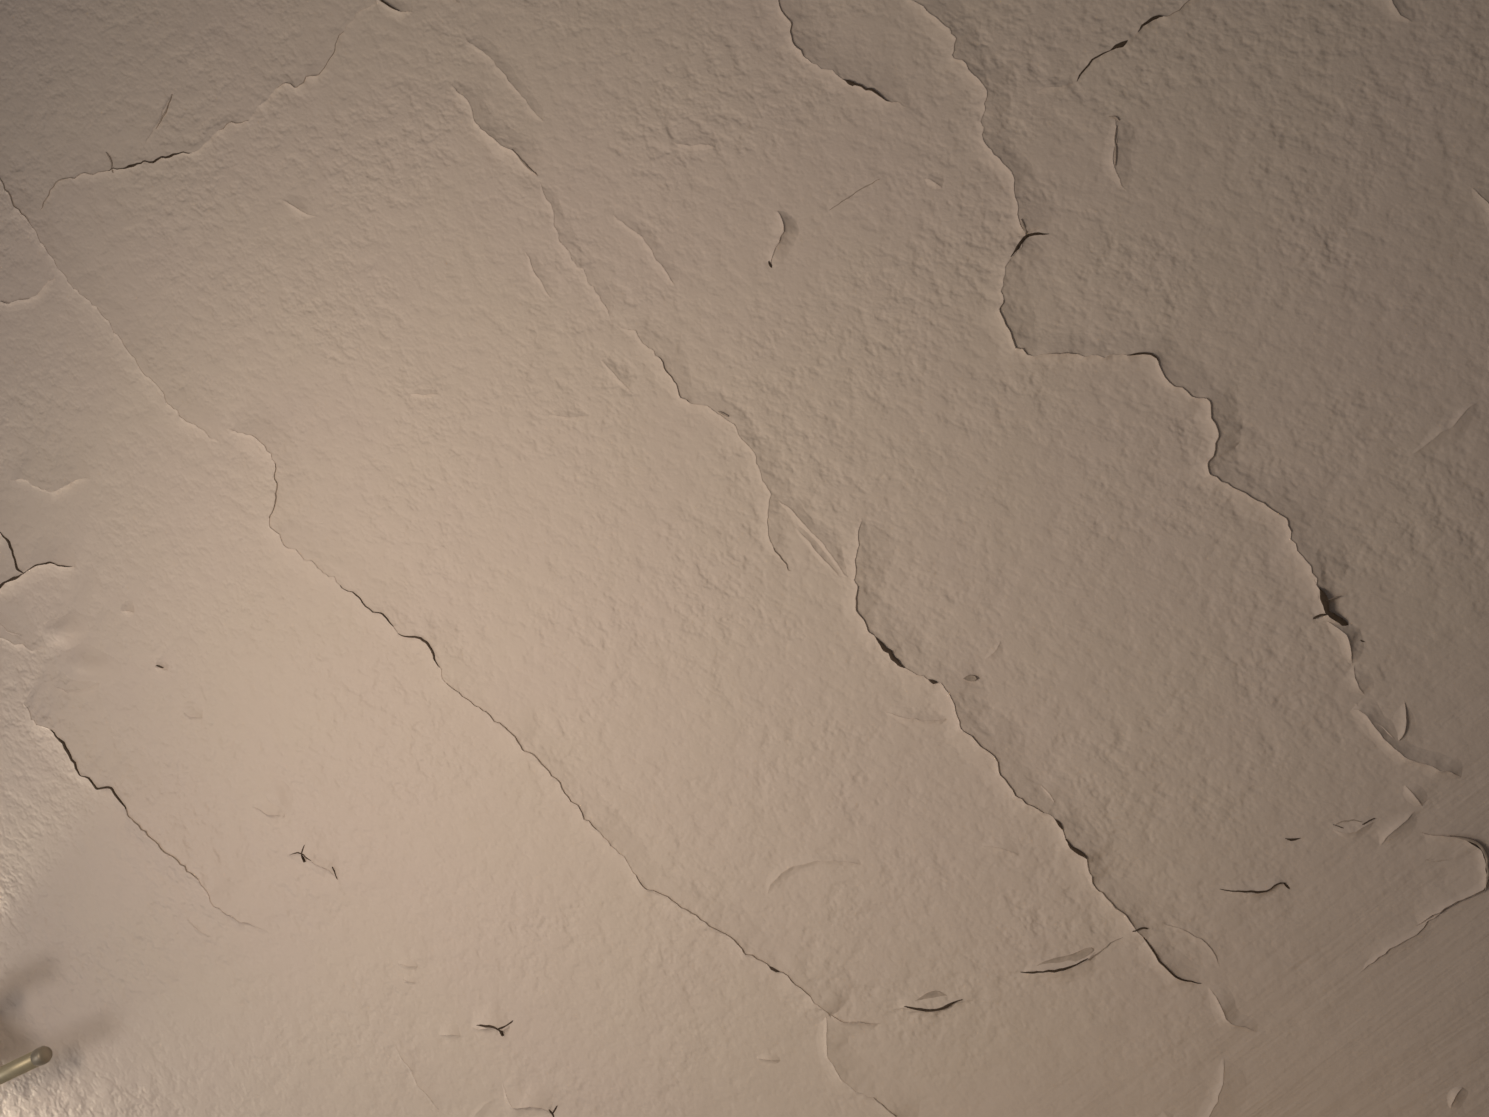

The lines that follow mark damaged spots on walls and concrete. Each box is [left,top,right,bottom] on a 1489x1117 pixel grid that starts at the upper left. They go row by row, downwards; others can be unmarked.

peeling [377,0,413,21]
peeling [765,0,909,117]
peeling [903,0,1364,664]
peeling [837,516,1258,1032]
peeling [1362,811,1489,971]